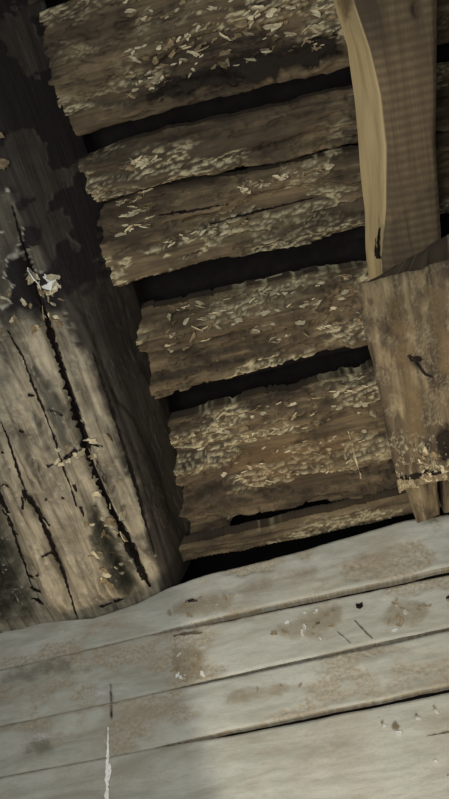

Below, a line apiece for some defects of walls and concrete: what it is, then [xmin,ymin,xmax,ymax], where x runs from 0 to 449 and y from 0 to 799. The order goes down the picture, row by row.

crack [0,205,155,619]
damp [436,429,449,460]